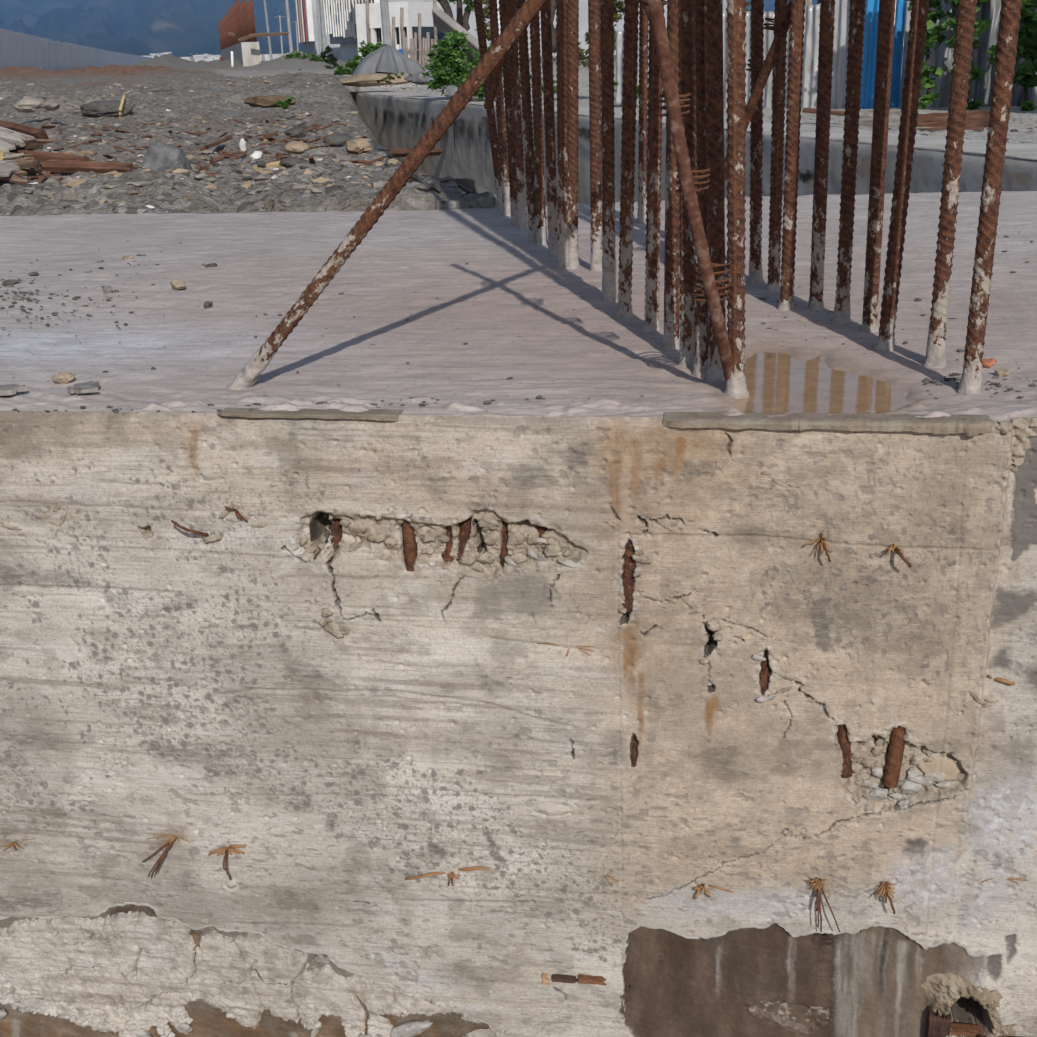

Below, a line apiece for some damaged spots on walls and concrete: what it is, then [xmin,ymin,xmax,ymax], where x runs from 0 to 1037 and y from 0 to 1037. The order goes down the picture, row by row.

spalling [992,417,1037,473]
spalling [293,508,590,580]
crack [304,556,380,620]
spalling [318,607,350,639]
spalling [834,722,970,814]
peeling [0,902,497,1037]
damp [623,923,970,1037]
peeling [621,919,988,993]
damp [0,1006,119,1037]
damp [148,1009,346,1037]
damp [363,1006,487,1037]